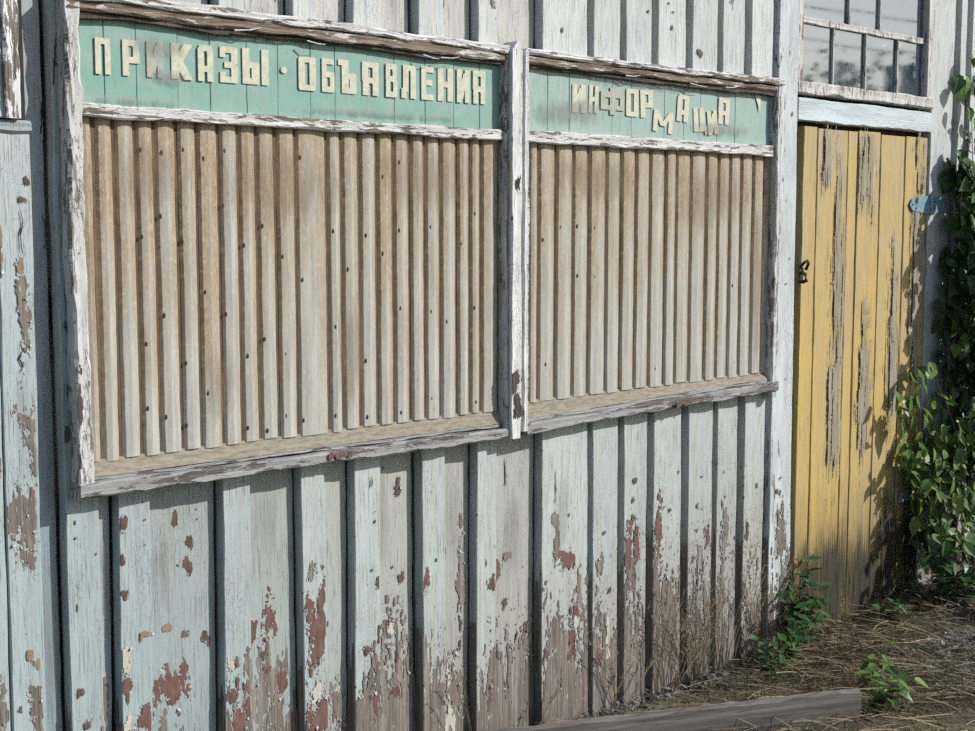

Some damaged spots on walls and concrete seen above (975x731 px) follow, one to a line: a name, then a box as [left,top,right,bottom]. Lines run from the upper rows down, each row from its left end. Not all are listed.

peeling [0,216,33,388]
peeling [512,369,522,428]
peeling [0,401,40,579]
peeling [120,513,128,535]
peeling [177,535,193,576]
peeling [208,477,790,731]
leakage [796,488,917,635]
peeling [0,646,44,731]
peeling [84,622,211,731]